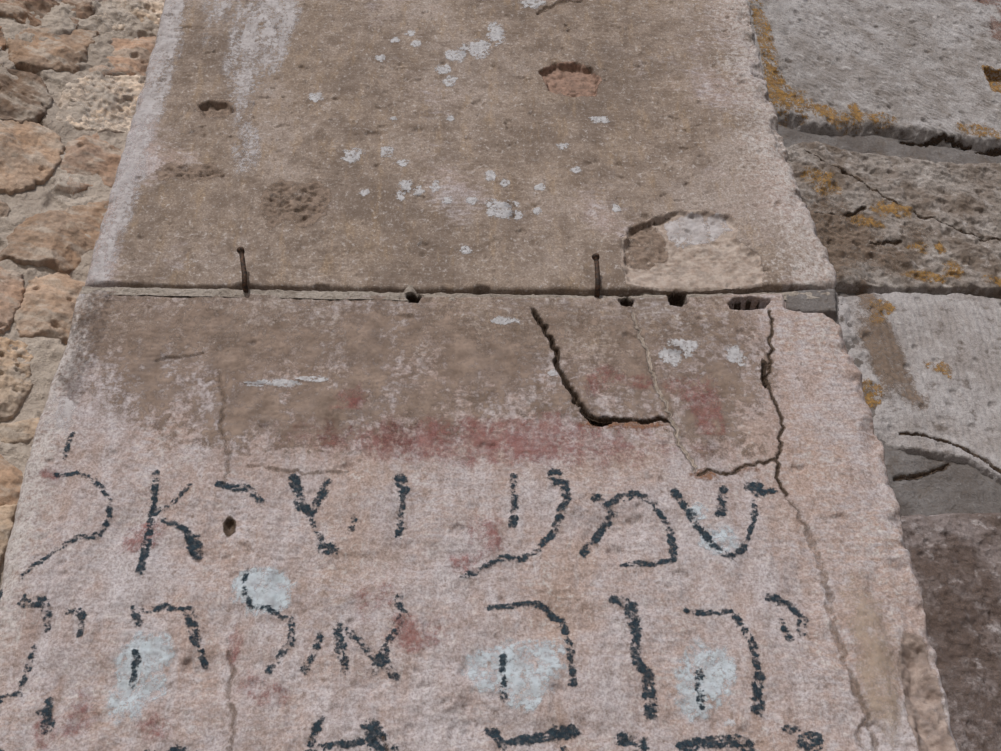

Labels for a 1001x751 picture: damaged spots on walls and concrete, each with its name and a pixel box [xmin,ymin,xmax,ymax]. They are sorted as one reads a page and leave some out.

spalling [539,61,602,97]
crack [899,133,1001,157]
crack [806,151,1001,242]
spalling [620,208,766,294]
crack [870,238,902,246]
crack [531,309,788,496]
crack [893,432,1001,481]